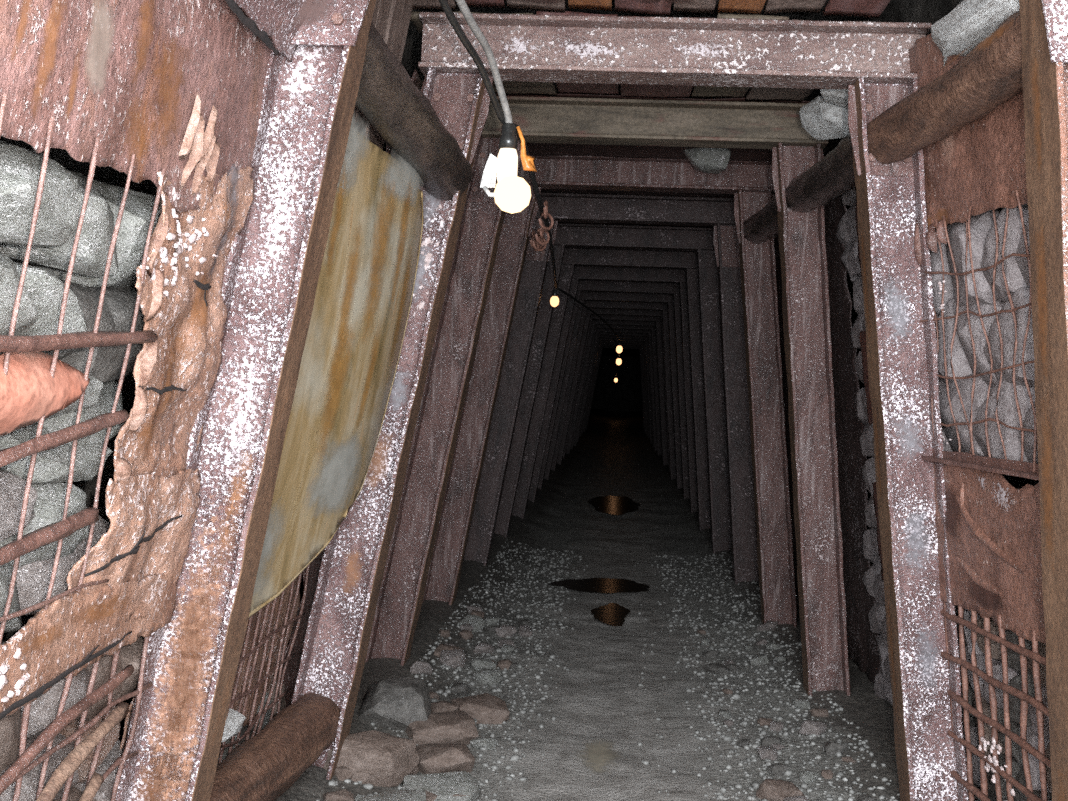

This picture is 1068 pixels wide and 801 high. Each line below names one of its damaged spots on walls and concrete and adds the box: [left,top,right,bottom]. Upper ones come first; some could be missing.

rust [0,0,314,324]
rust [129,339,180,441]
rust [116,457,132,482]
crack [85,515,182,577]